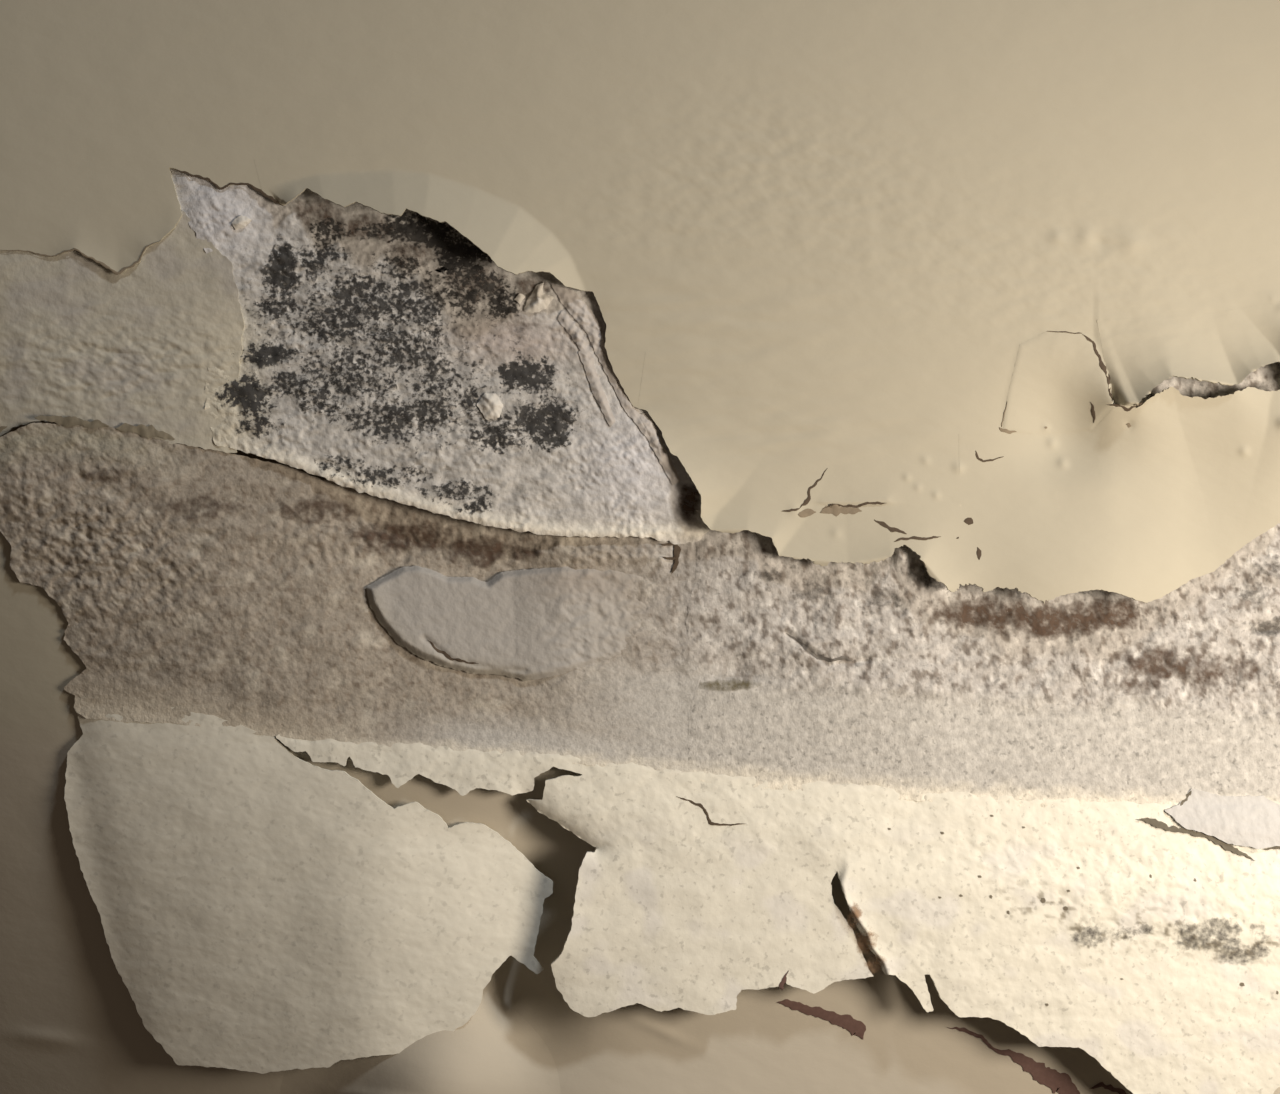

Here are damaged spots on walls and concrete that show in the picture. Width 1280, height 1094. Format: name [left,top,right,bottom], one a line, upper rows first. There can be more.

flaking render [0,211,244,453]
water stain [215,205,578,514]
spalling [170,154,962,592]
peeling [1003,302,1280,434]
water stain [352,525,540,567]
water stain [680,486,699,519]
crack [783,469,981,560]
water stain [941,597,1148,637]
water stain [1121,648,1223,687]
water stain [1254,617,1280,635]
flaking render [0,423,1280,1094]
crack [676,796,745,826]